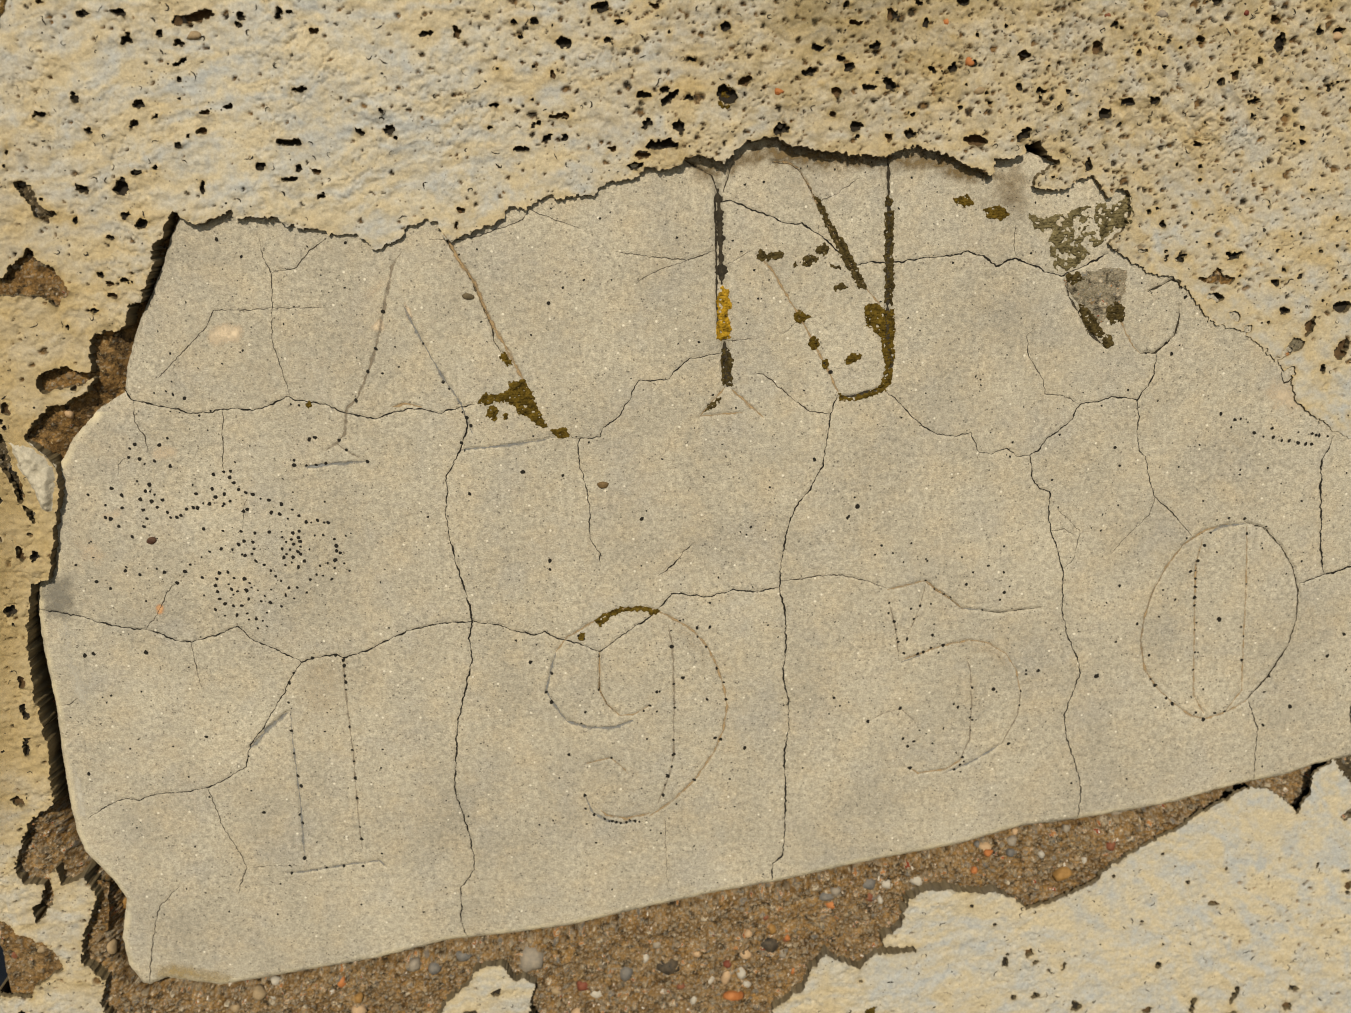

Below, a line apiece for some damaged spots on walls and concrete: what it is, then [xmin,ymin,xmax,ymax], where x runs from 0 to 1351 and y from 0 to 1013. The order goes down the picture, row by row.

spalling [113,165,158,195]
spalling [282,164,321,181]
crack [431,209,581,241]
crack [722,181,1108,277]
spalling [1064,267,1127,324]
spalling [1198,251,1241,303]
spalling [0,212,179,519]
crack [1300,436,1351,583]
crack [40,240,880,933]
crack [887,328,1192,818]
spalling [19,755,1351,1013]
crack [149,888,178,981]